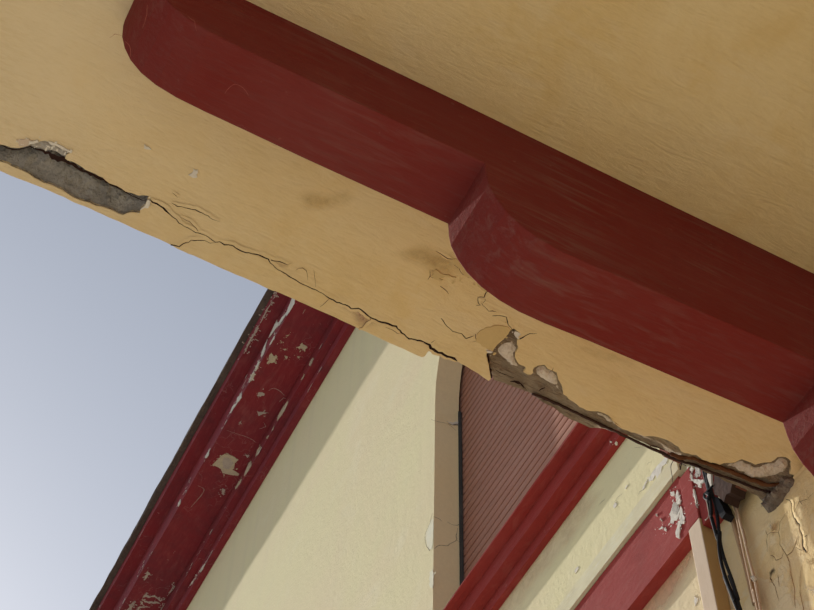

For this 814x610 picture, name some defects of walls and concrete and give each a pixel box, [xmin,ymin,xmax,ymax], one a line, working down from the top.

spalling [0,137,150,214]
crack [150,191,478,362]
peeling [205,445,262,489]
peeling [221,292,307,429]
spalling [475,322,795,513]
peeling [122,582,175,610]
crack [766,492,814,610]